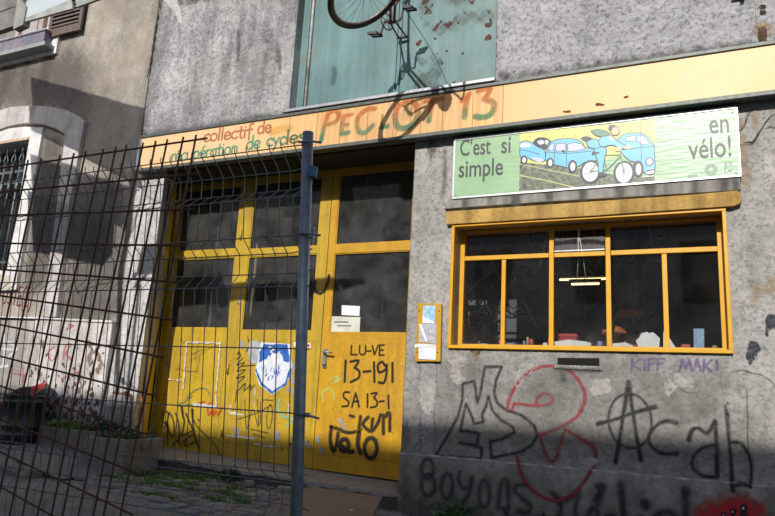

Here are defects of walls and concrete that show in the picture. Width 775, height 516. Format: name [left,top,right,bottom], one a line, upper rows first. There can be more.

rust [754,0,770,42]
crack [739,110,775,146]